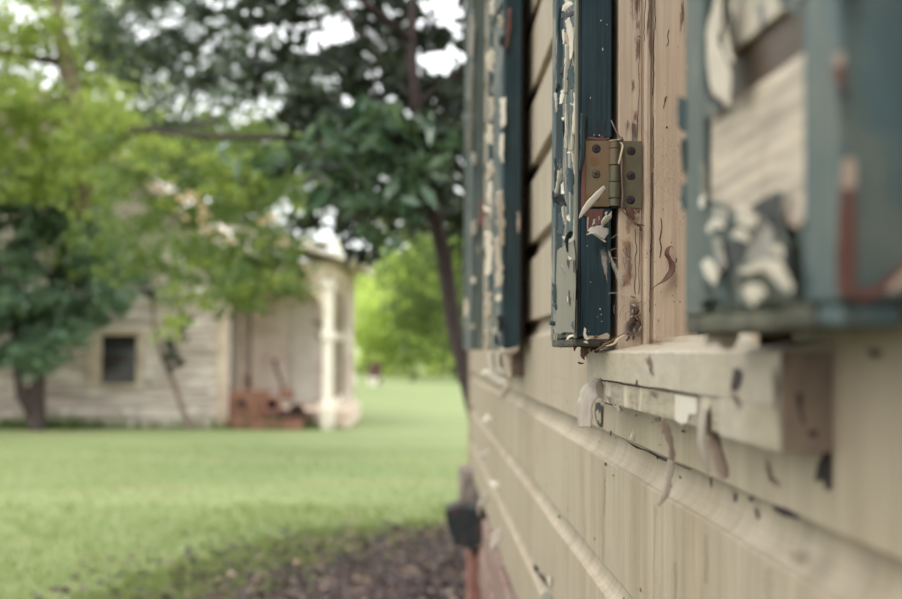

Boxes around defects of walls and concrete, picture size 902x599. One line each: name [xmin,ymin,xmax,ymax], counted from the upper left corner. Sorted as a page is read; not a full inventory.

peeling [467,0,476,165]
peeling [485,0,512,74]
peeling [632,0,652,56]
peeling [702,0,735,119]
peeling [471,97,519,398]
peeling [549,0,610,348]
peeling [666,96,687,210]
peeling [698,191,801,307]
peeling [836,157,902,301]
spalling [627,441,692,479]
peeling [675,394,697,432]
spalling [773,505,800,519]